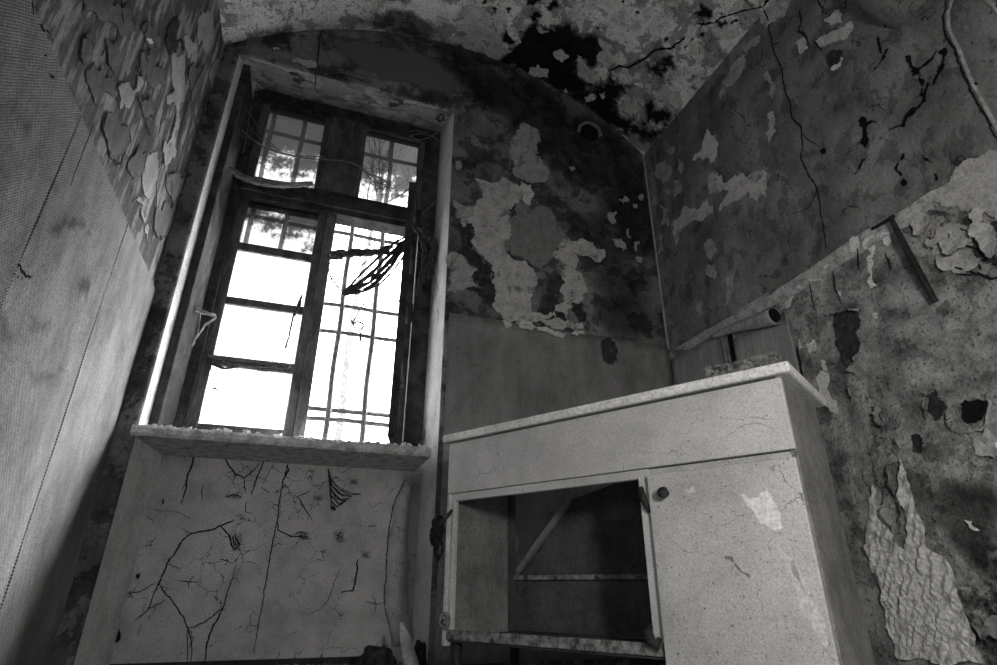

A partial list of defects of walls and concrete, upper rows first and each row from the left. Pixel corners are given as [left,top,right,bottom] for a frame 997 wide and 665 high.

peeling [102,9,225,242]
crack [608,0,847,248]
peeling [445,121,642,335]
peeling [607,129,767,255]
crack [809,272,842,311]
peeling [910,205,997,276]
spalling [922,389,997,457]
crack [127,457,312,662]
crack [307,481,405,640]
water stain [924,487,997,566]
water stain [959,582,997,621]
water stain [975,633,997,665]